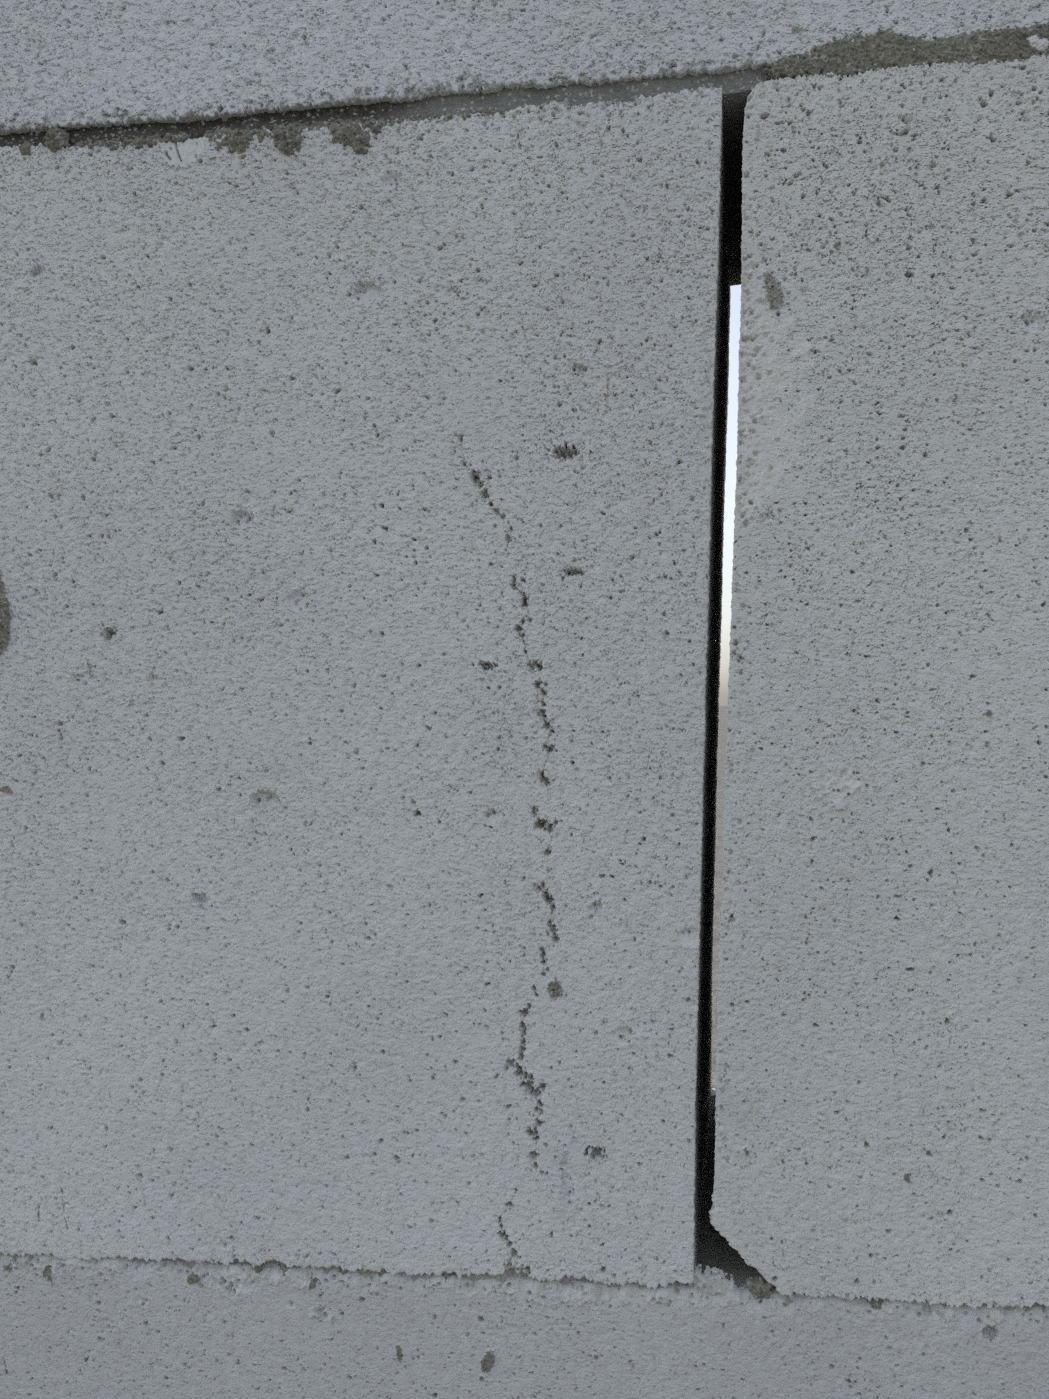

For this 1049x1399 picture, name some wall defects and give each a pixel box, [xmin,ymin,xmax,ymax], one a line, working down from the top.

crack [454,431,562,1276]